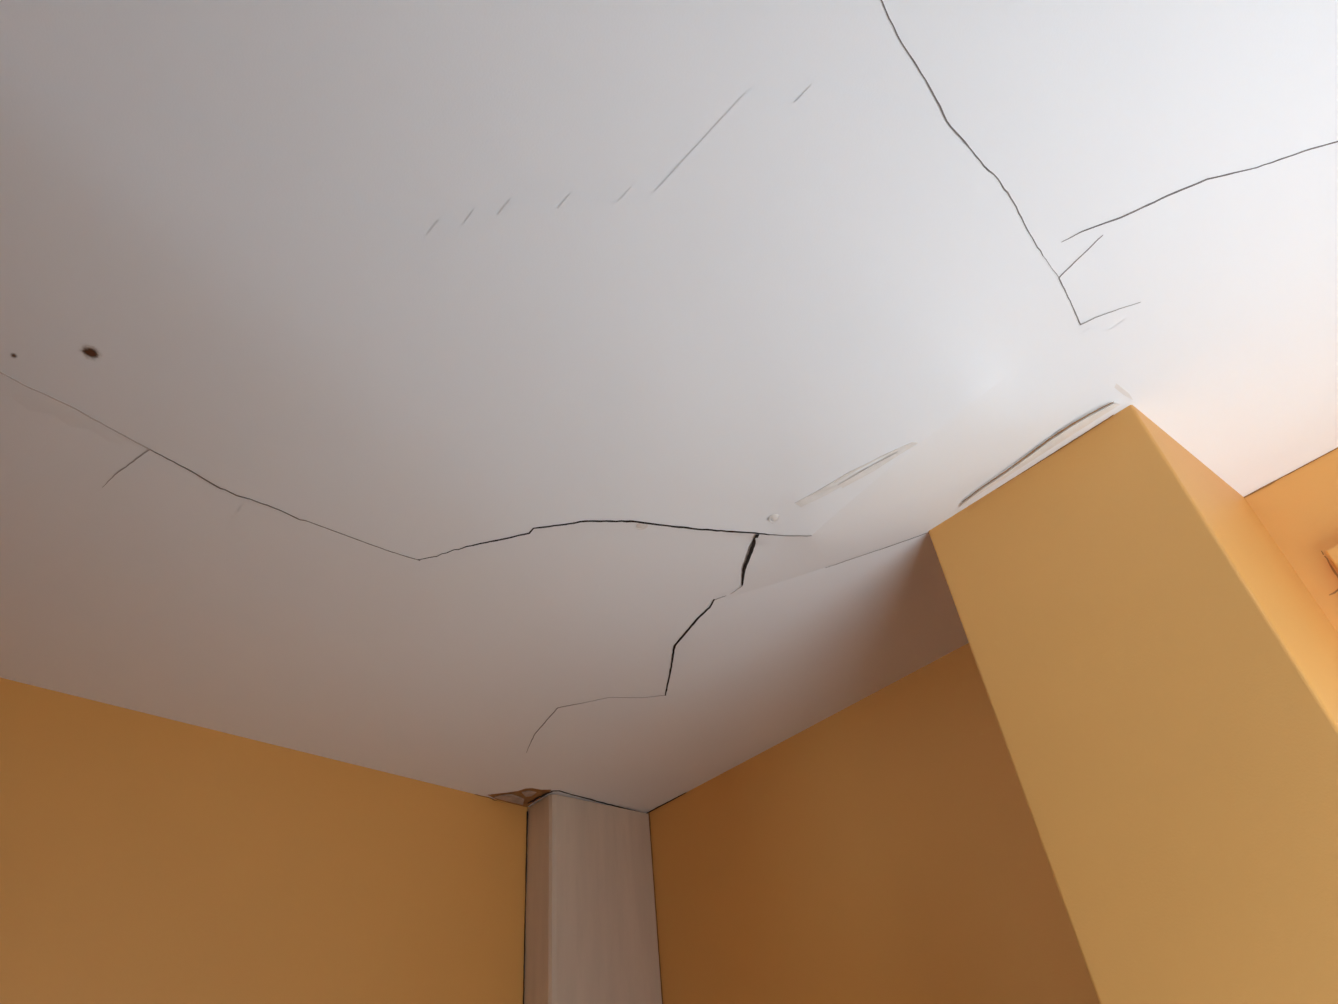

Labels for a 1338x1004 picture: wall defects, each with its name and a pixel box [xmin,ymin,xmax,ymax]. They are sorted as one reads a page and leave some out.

crack [881,0,1338,325]
crack [0,372,812,751]